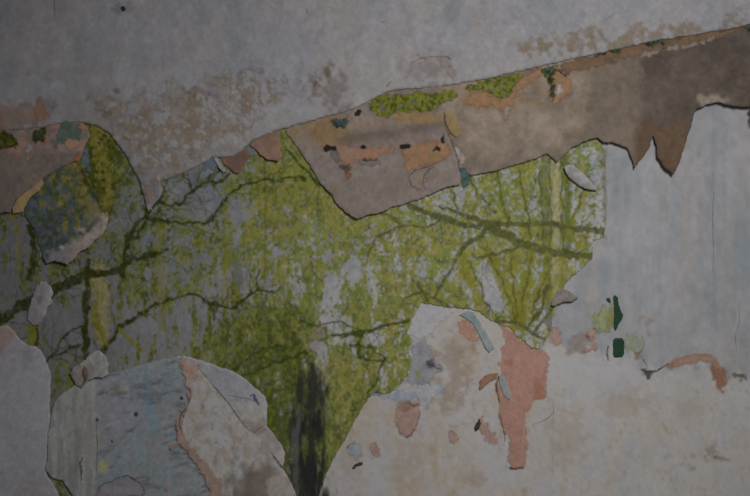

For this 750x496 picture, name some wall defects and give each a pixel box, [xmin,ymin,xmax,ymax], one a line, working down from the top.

peeling [0,122,108,265]
spalling [89,67,289,211]
peeling [285,24,750,219]
peeling [0,325,296,496]
peeling [347,442,380,469]
peeling [372,304,549,470]